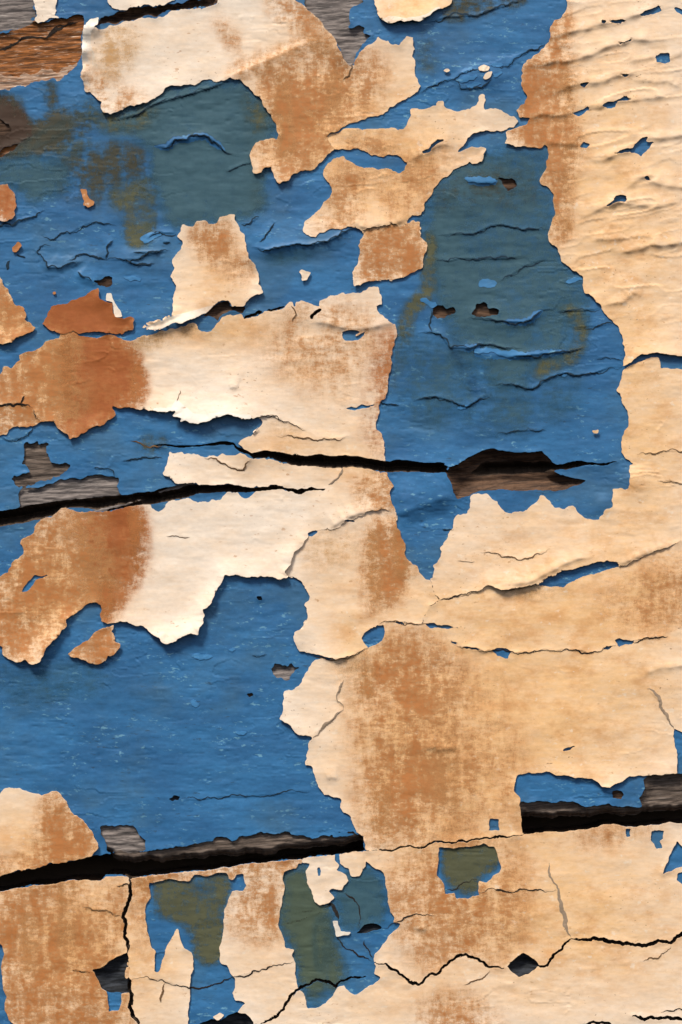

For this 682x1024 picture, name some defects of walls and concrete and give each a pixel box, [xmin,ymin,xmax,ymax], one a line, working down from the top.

peeling [640,6,661,16]
peeling [603,96,630,108]
peeling [616,137,654,156]
crack [0,415,682,527]
crack [363,832,526,852]
peeling [651,830,664,849]
peeling [663,841,682,874]
crack [84,874,137,951]
crack [447,865,682,968]
peeling [0,847,682,1024]
crack [127,893,502,1024]
crack [586,1008,682,1024]